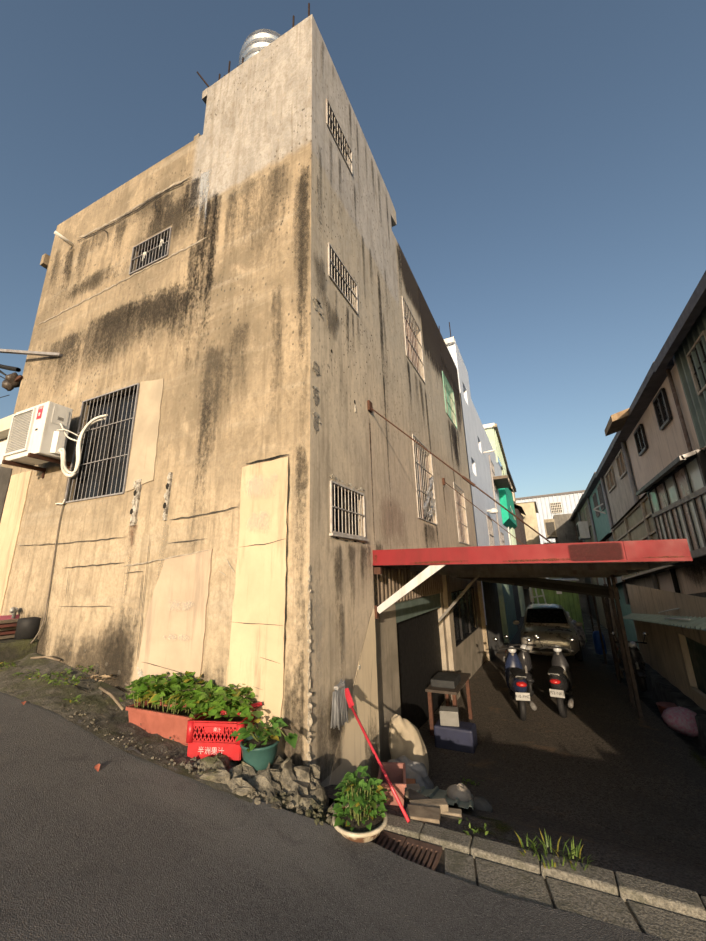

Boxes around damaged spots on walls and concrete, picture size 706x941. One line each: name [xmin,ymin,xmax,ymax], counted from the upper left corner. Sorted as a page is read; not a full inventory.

water stain [54,172,233,368]
water stain [296,172,324,301]
water stain [201,352,231,436]
water stain [296,453,306,503]
water stain [335,545,366,590]
water stain [36,617,133,692]